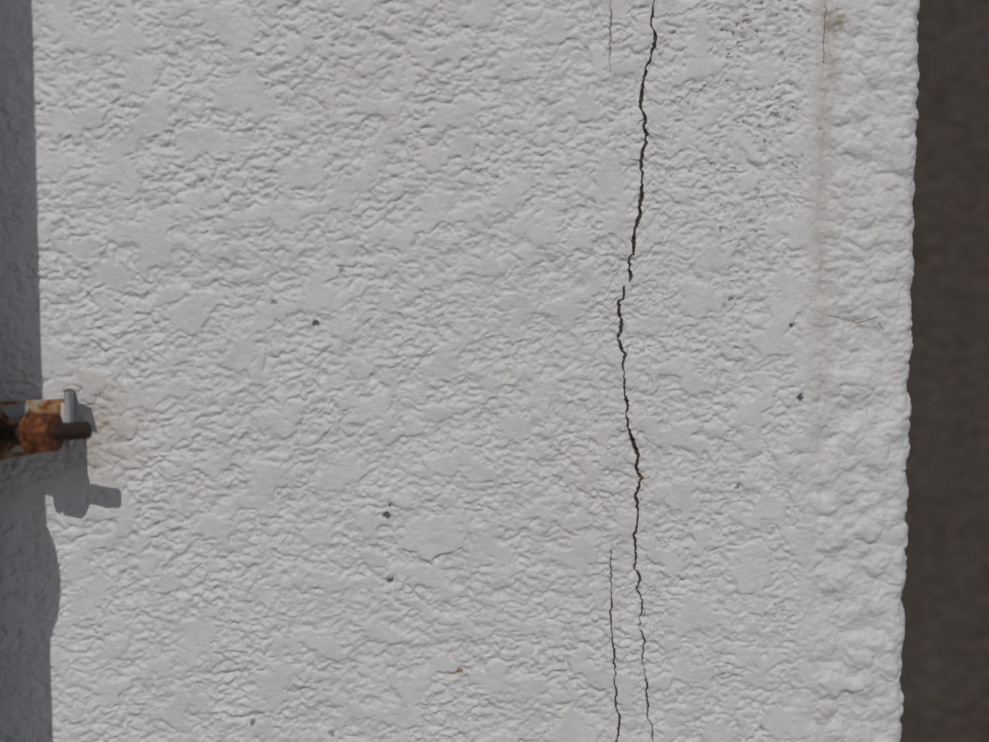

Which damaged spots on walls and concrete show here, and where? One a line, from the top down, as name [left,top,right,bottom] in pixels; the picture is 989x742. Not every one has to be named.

crack [606,1,614,73]
crack [609,0,657,742]